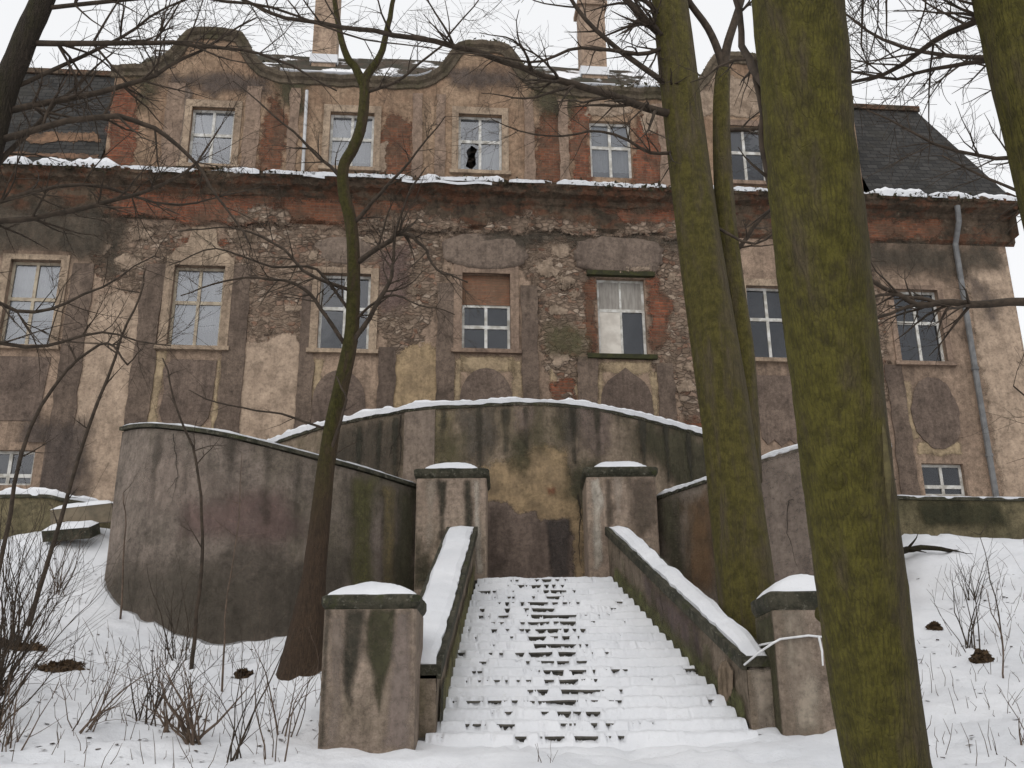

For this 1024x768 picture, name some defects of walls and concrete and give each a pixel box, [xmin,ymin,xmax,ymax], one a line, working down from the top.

flaking render [105,87,140,166]
flaking render [375,112,413,175]
flaking render [534,101,668,188]
flaking render [867,218,943,243]
flaking render [74,192,702,502]
damp [435,407,534,467]
damp [636,420,706,485]
damp [105,435,303,646]
damp [415,480,446,587]
damp [465,480,482,573]
crack [575,494,583,568]
damp [322,609,410,747]